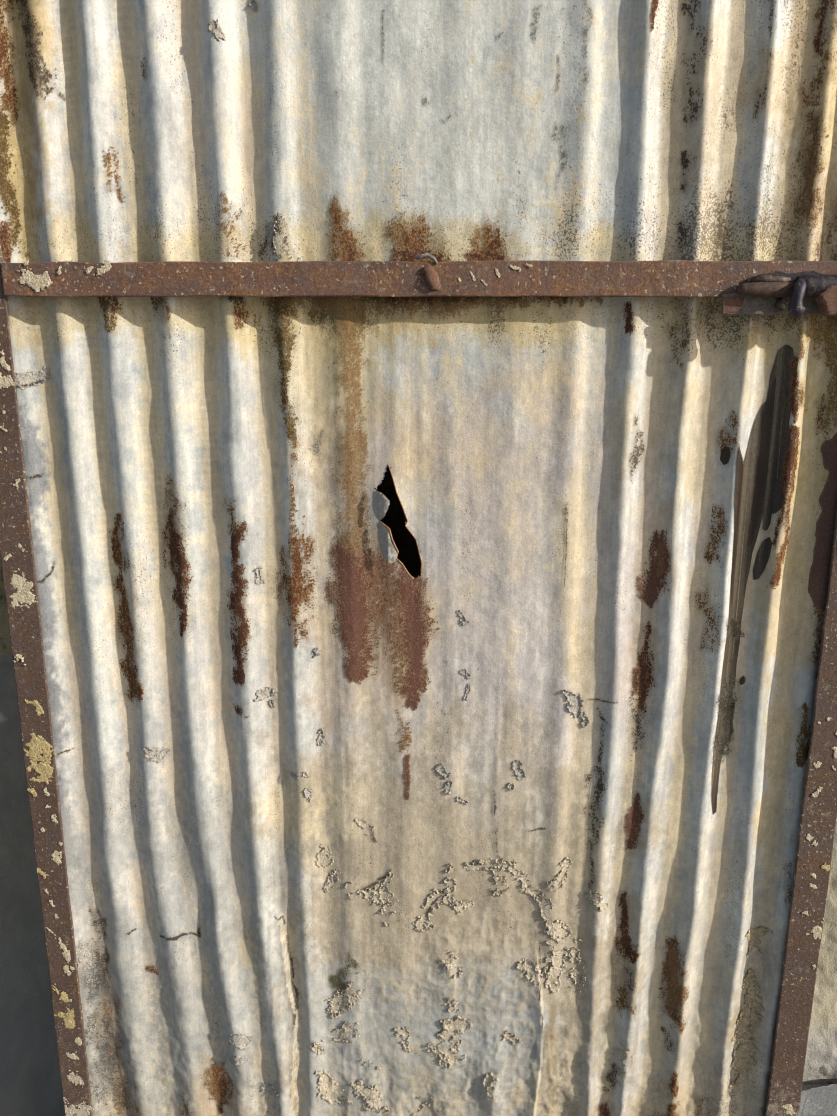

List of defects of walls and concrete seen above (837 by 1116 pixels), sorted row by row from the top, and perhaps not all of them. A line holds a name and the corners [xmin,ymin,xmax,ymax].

corrosion [0,0,70,263]
corrosion [792,0,837,261]
corrosion [109,513,144,704]
corrosion [160,478,194,637]
corrosion [220,296,603,800]
corrosion [629,530,671,752]
damp [712,344,798,814]
peeling [310,981,365,1055]
peeling [314,1059,390,1114]
peeling [315,844,399,927]
peeling [427,997,473,1070]
peeling [413,857,587,994]